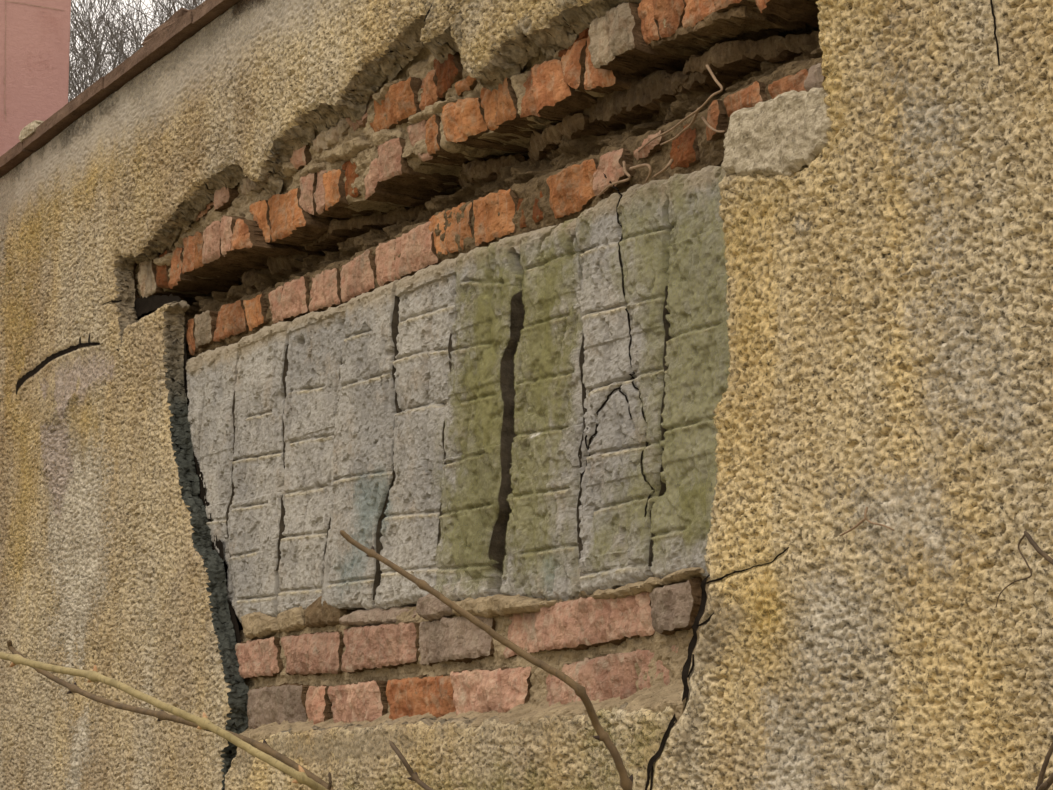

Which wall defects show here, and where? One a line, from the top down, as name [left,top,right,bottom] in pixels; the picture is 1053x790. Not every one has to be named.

crack [990,0,1000,65]
crack [16,333,119,395]
crack [102,294,188,404]
crack [190,373,238,562]
spalling [133,0,826,771]
crack [488,290,525,572]
crack [227,600,241,643]
crack [645,547,789,790]